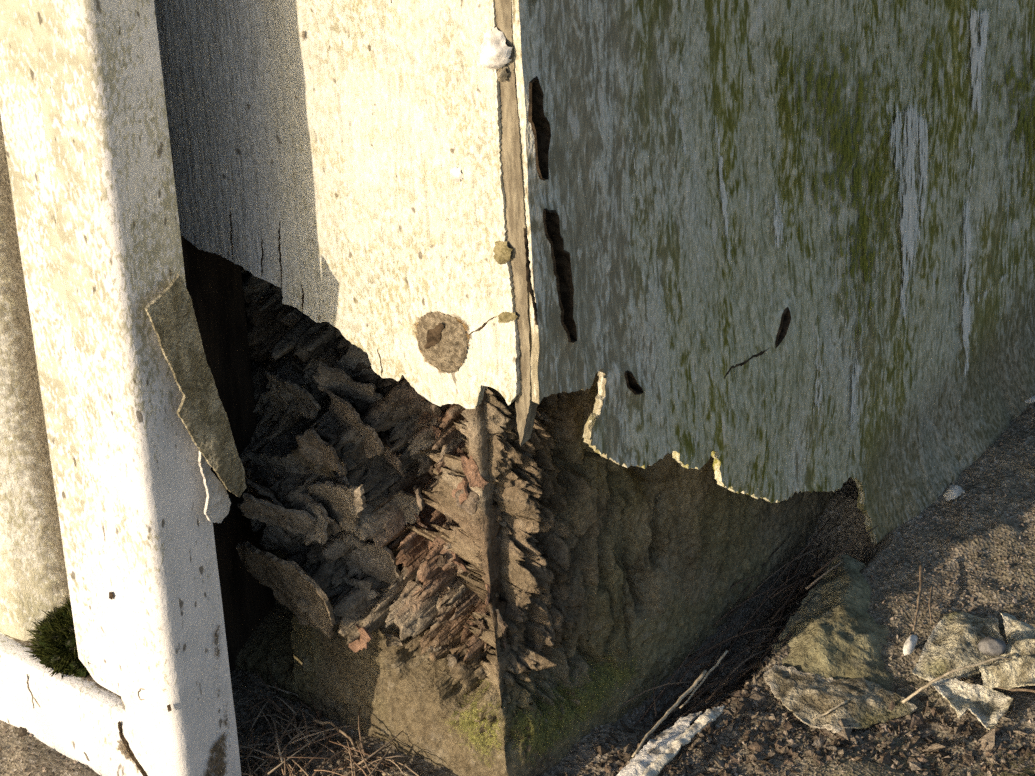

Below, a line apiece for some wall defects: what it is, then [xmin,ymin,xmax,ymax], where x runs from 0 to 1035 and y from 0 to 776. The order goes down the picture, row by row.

crack [528,76,551,181]
crack [523,208,577,343]
water stain [715,117,732,259]
crack [724,307,791,379]
water stain [768,2,953,434]
water stain [961,147,1020,375]
water stain [970,9,1035,213]
spalling [145,274,471,639]
spalling [452,448,489,515]
spalling [349,624,372,653]
spalling [476,584,508,649]
water stain [448,657,636,764]